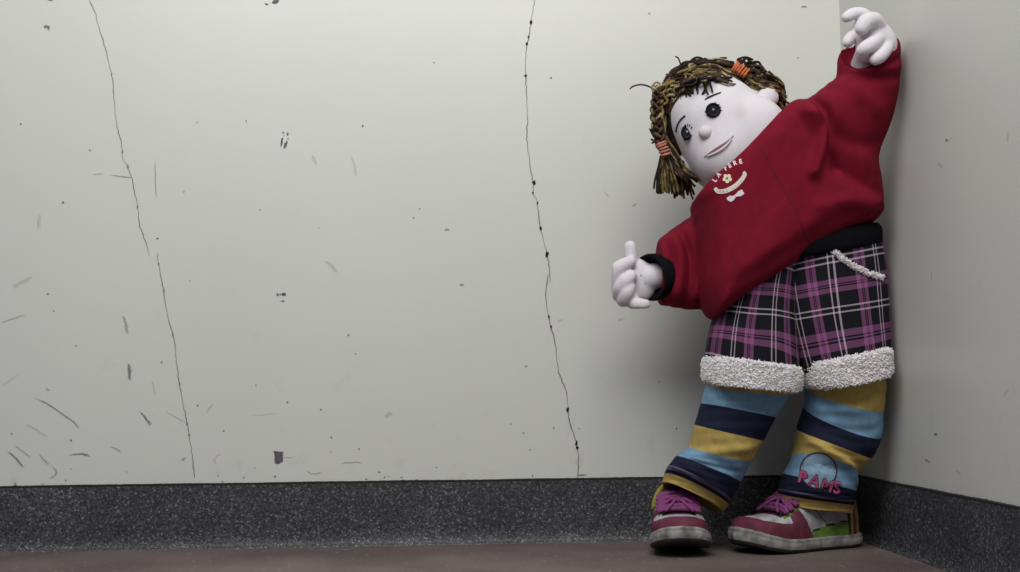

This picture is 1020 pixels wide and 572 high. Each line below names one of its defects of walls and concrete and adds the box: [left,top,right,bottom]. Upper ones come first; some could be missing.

crack [89,0,195,478]
crack [524,0,587,476]